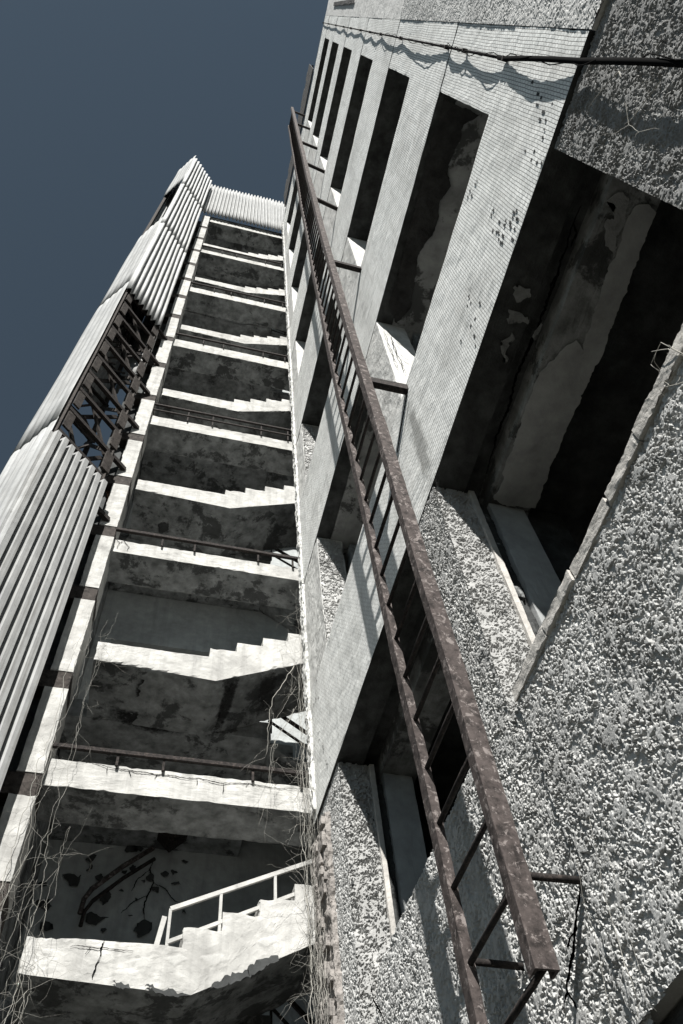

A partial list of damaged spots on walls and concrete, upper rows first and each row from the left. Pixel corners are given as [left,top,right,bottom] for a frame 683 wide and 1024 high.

peeling [479,192,656,637]
damp [112,706,179,733]
damp [215,683,237,730]
damp [257,672,276,716]
crack [121,862,180,919]
crack [73,940,131,978]
crack [564,884,581,1010]